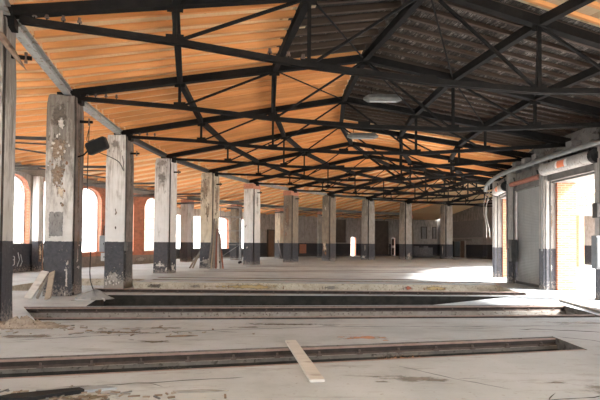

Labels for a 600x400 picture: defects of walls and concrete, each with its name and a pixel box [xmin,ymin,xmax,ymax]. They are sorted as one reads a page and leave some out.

flaking render [48,118,71,238]